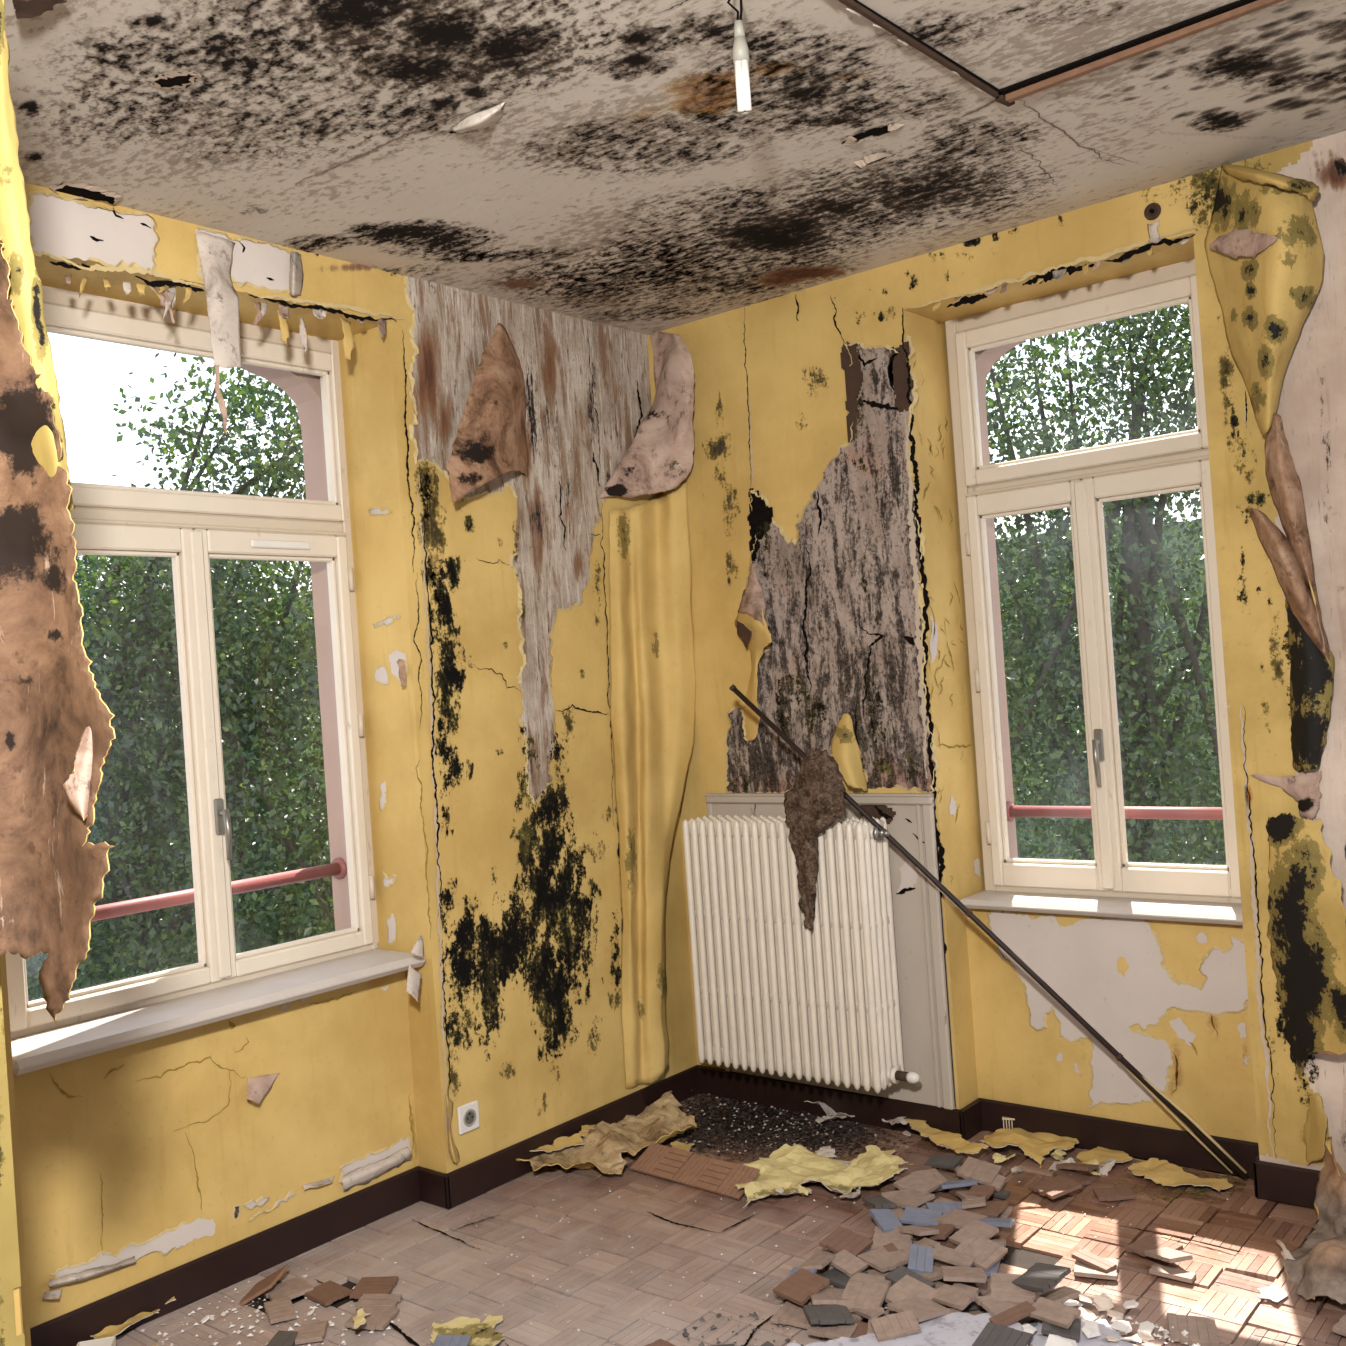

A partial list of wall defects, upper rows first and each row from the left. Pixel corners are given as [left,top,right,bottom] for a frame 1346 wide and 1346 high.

flaking render [27,191,204,324]
crack [295,104,489,186]
leakage [18,0,1123,325]
crack [1018,145,1058,187]
crack [833,0,1285,166]
leakage [1133,8,1346,132]
leakage [414,462,474,836]
flaking render [404,276,652,804]
flaking render [724,334,939,793]
leakage [438,706,622,1096]
peeling [986,910,1248,1110]
crack [50,1020,249,1214]